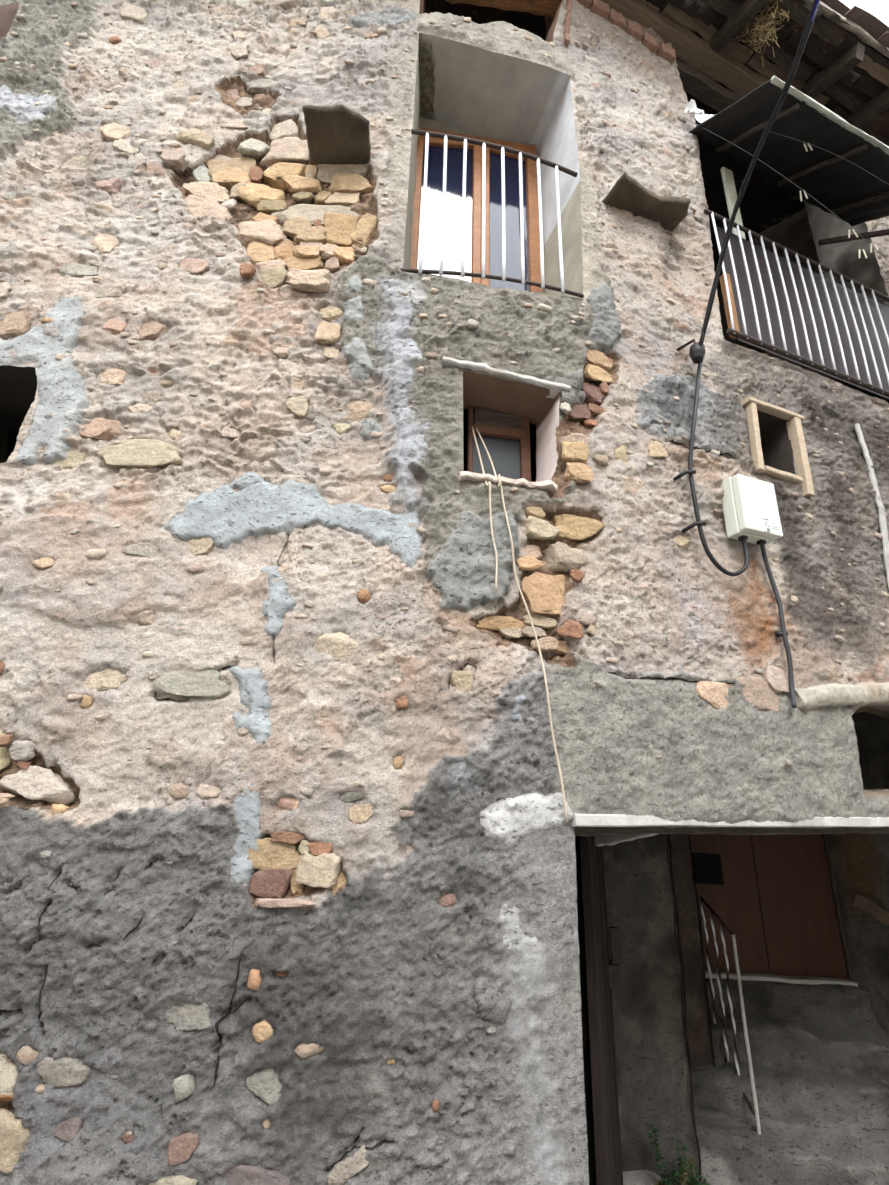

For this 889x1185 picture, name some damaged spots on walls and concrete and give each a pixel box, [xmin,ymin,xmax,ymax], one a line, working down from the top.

flaking render [160,108,379,360]
leakage [804,402,889,479]
flaking render [470,349,621,668]
leakage [772,478,806,617]
flaking render [0,730,80,809]
flaking render [246,831,346,908]
crack [1,860,158,1034]
crack [210,958,250,1090]
flaking render [0,1053,30,1174]